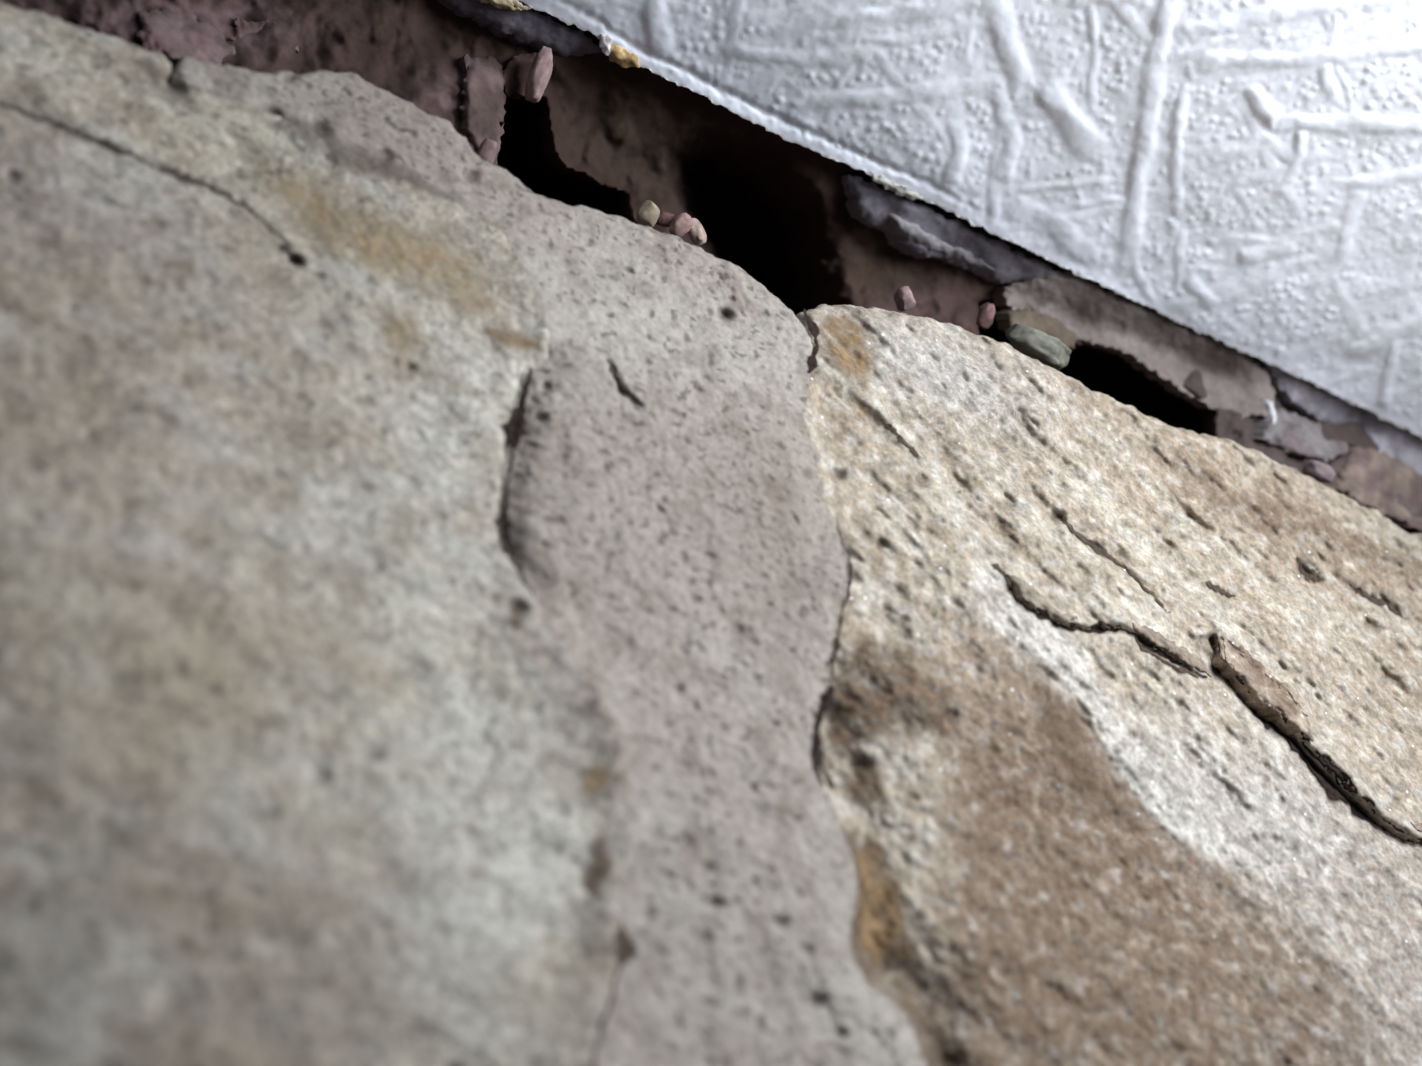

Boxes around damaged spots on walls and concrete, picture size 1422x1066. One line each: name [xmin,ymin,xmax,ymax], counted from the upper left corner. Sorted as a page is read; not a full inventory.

spalling [525,46,553,103]
crack [0,104,306,264]
peeling [884,213,1004,272]
crack [804,309,820,373]
crack [495,367,535,597]
crack [881,419,921,458]
peeling [1260,399,1277,424]
crack [1056,508,1171,612]
crack [812,531,853,800]
crack [992,557,1422,845]